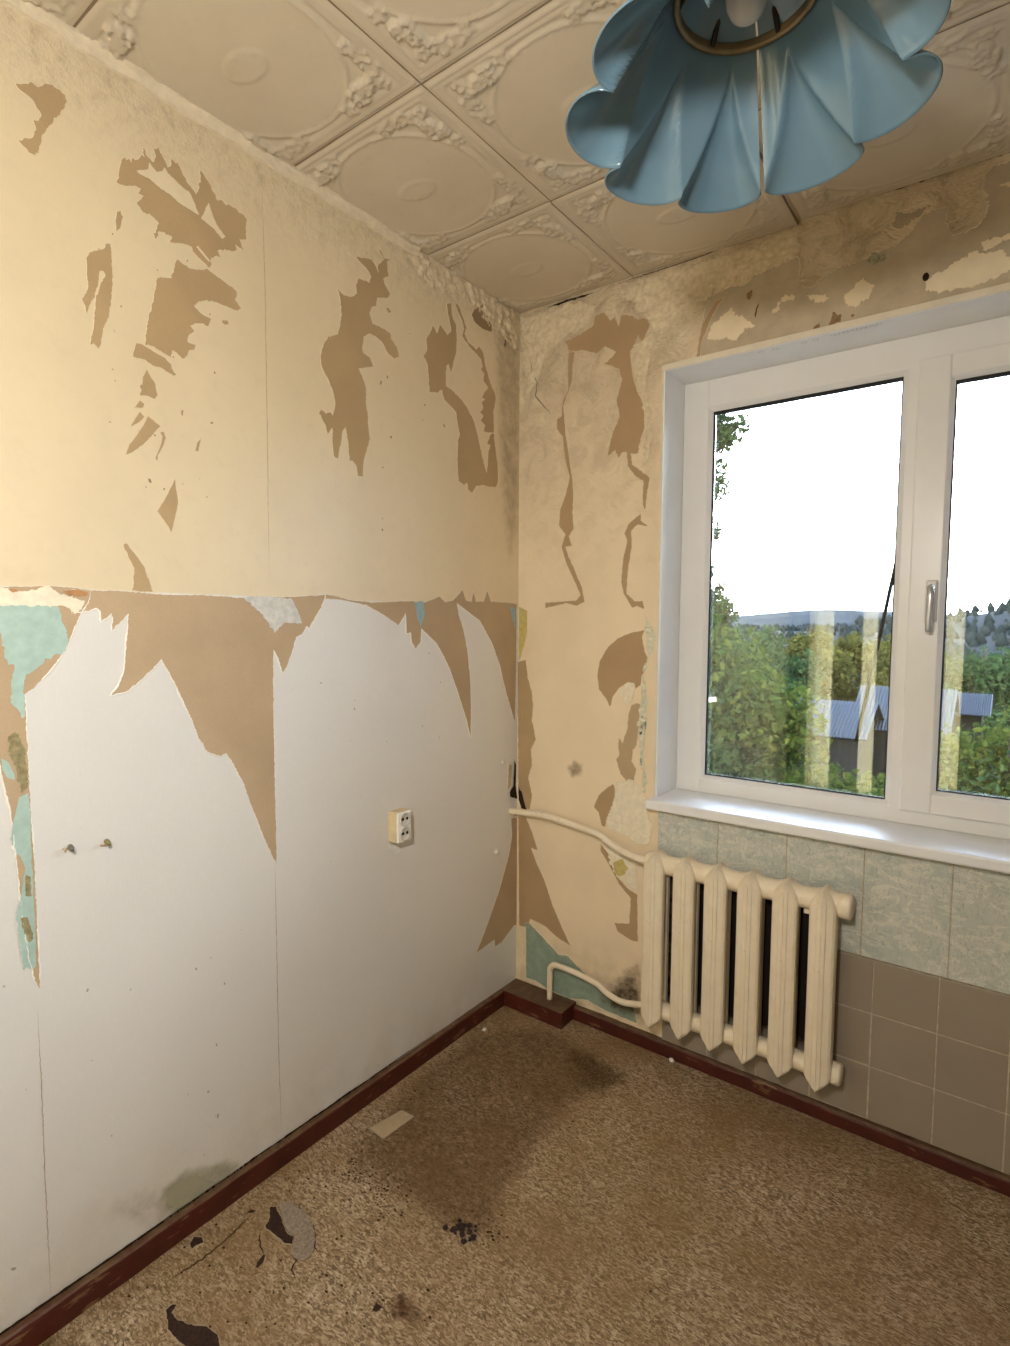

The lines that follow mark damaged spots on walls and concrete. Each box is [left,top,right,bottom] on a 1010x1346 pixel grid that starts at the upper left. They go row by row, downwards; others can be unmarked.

peeling [16,82,67,155]
peeling [82,211,123,348]
peeling [117,148,247,461]
peeling [319,250,399,477]
peeling [145,479,183,532]
spalling [407,159,1010,942]
peeling [0,543,570,988]
leakage [168,1170,218,1209]